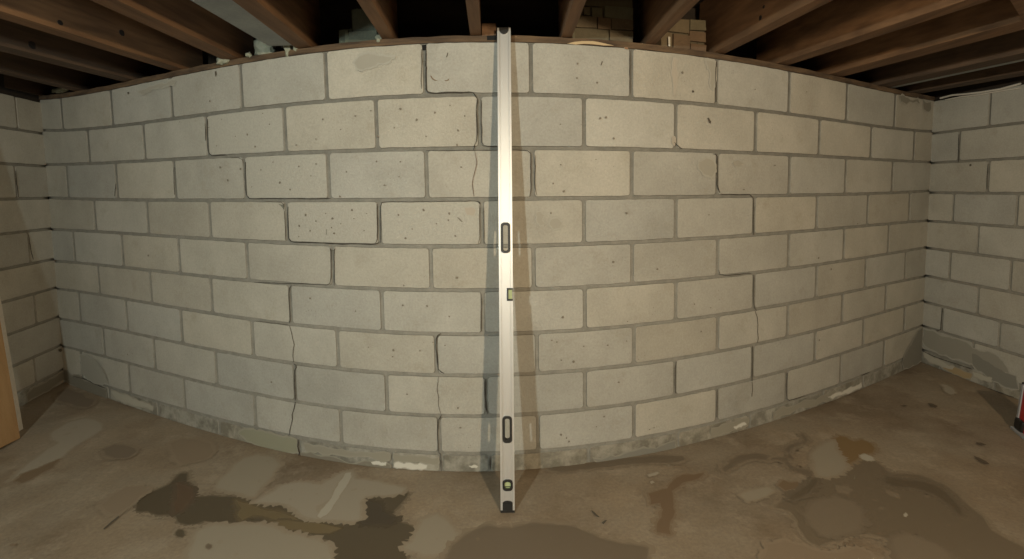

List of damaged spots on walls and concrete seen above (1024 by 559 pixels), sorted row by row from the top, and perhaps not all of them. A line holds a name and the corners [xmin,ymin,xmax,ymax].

crack [715,154,754,235]
crack [205,49,537,471]
damp [710,417,749,437]
damp [132,428,656,559]
damp [716,432,1024,559]